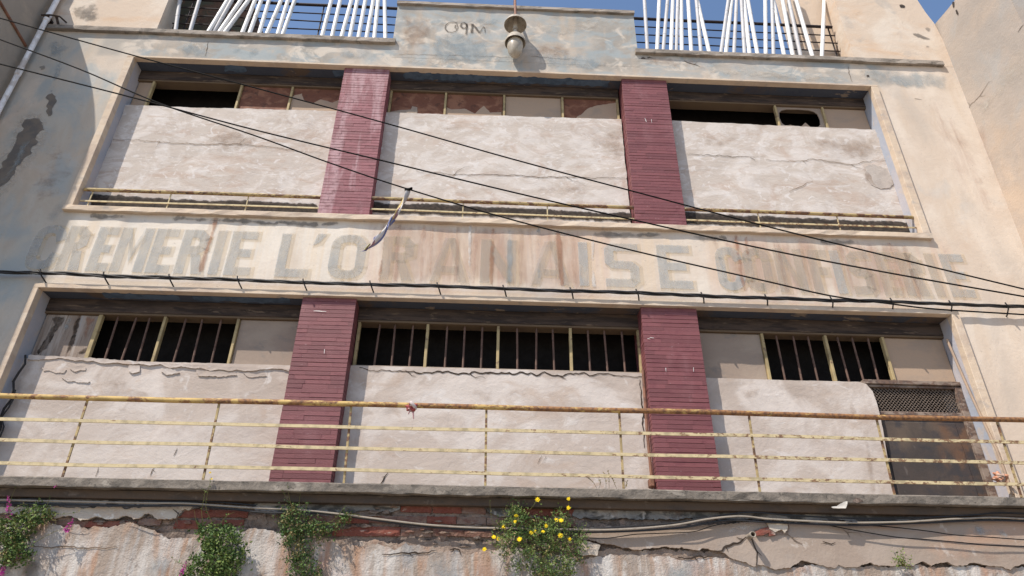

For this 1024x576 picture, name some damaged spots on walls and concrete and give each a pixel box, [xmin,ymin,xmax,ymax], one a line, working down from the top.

peeling [0,93,57,186]
peeling [28,355,289,383]
crack [359,367,645,448]
spalling [14,505,600,557]
spalling [754,523,789,537]